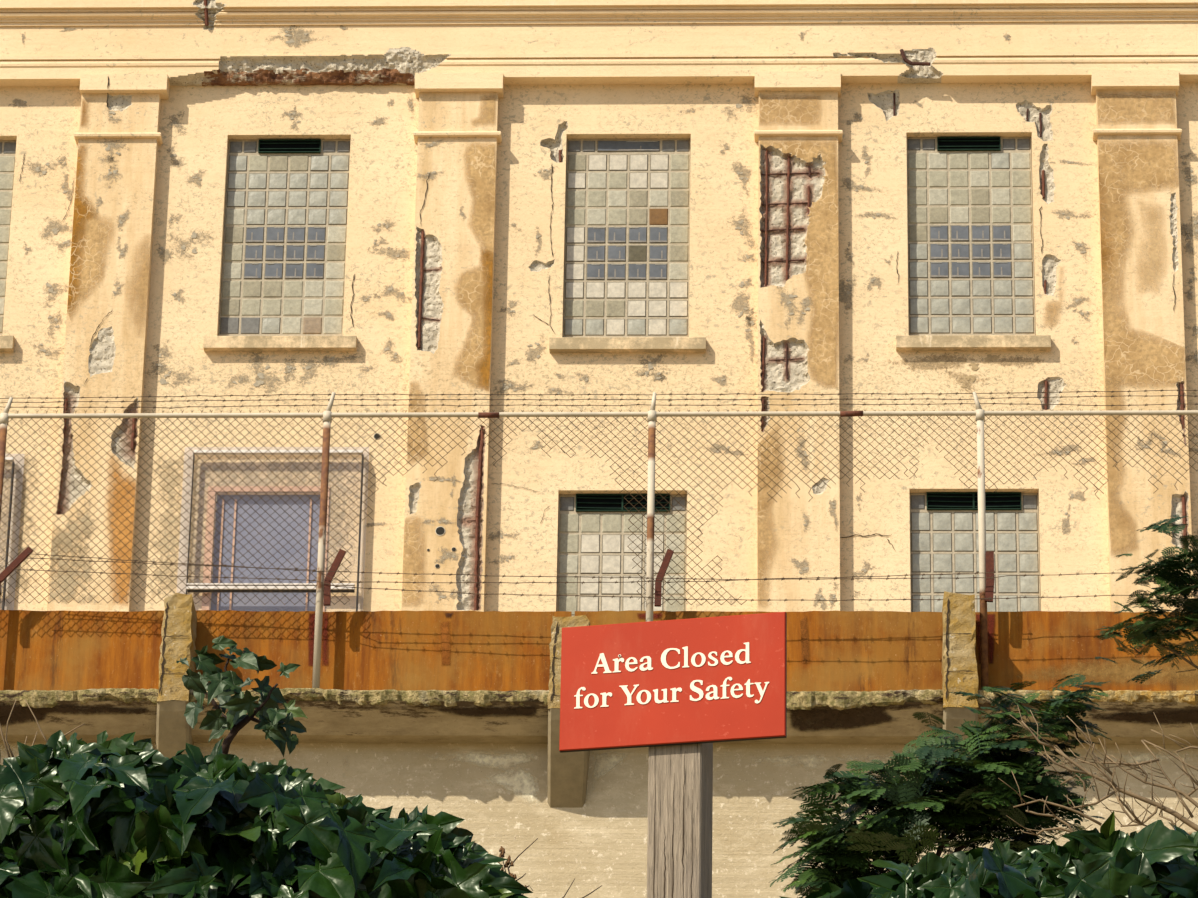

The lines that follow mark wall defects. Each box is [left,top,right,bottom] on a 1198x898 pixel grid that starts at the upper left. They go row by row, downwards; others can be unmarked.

spalling [169,25,451,125]
spalling [1016,100,1096,219]
damp [67,201,111,317]
spalling [361,219,444,354]
damp [457,143,496,388]
spalling [721,143,826,432]
spalling [1041,254,1061,297]
damp [1098,141,1185,553]
spalling [56,381,92,515]
spalling [111,397,139,469]
spalling [408,425,519,611]
crack [840,533,895,550]